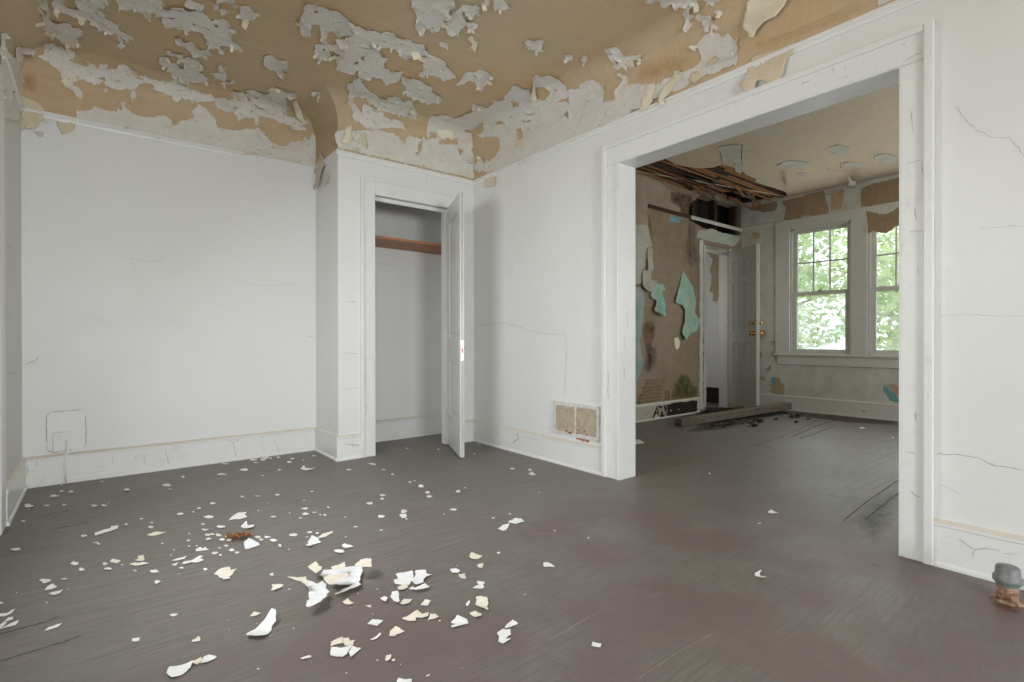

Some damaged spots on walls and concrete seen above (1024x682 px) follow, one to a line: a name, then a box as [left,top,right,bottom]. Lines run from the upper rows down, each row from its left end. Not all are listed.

peeling [1,0,324,189]
peeling [295,0,786,187]
crack [954,105,1024,156]
flaking render [750,189,844,232]
flaking render [861,177,899,207]
flaking render [697,229,760,302]
crack [906,451,1021,470]